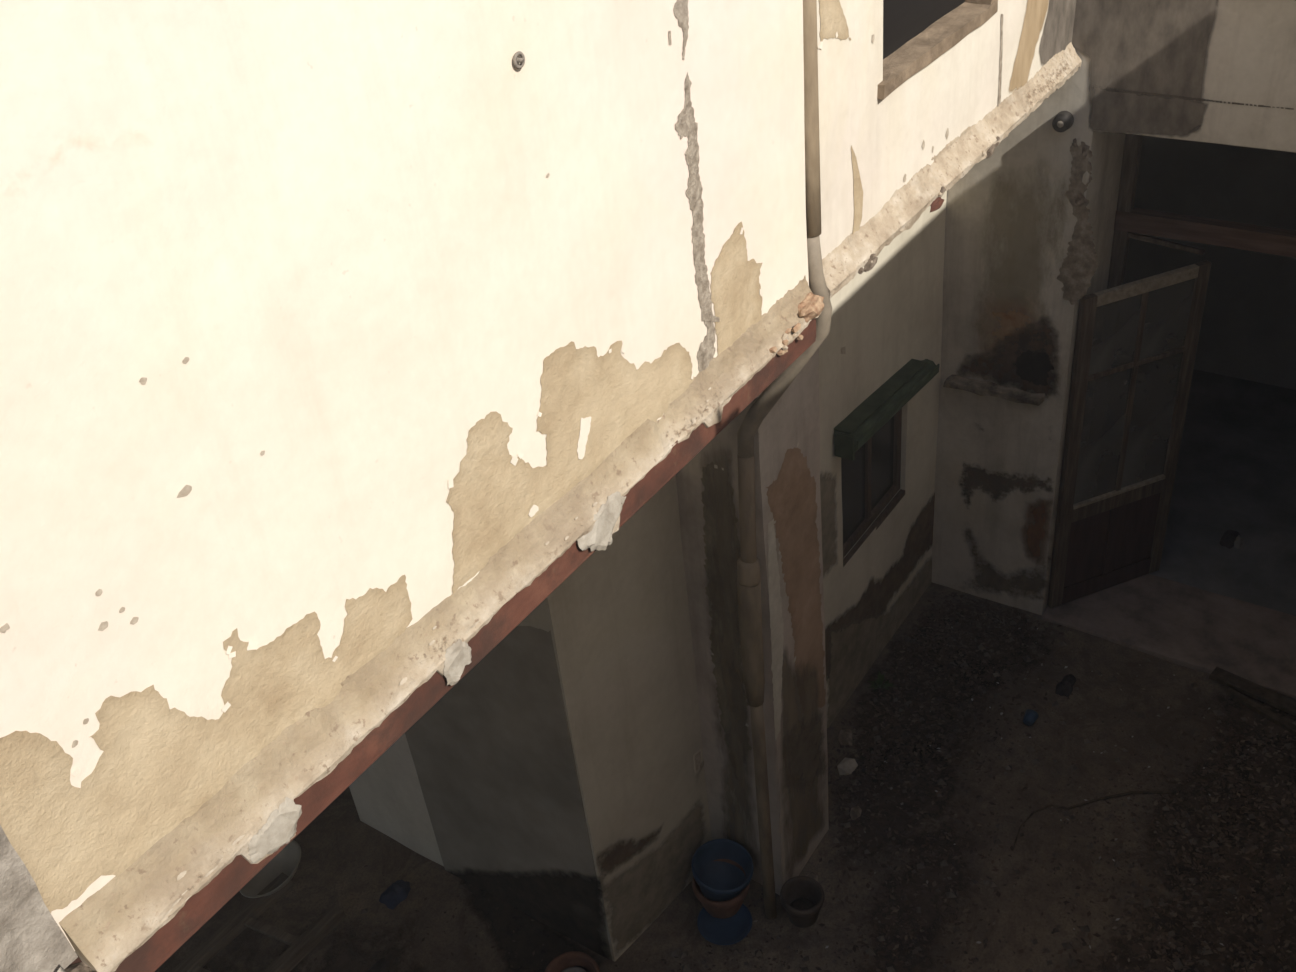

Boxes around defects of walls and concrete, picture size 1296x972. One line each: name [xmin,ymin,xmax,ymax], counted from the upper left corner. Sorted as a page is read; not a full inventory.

peeling [818,0,851,49]
damp [1009,0,1218,137]
peeling [710,221,763,357]
flaking render [769,292,824,355]
flaking render [1057,138,1097,305]
peeling [429,626,472,686]
peeling [446,340,711,594]
peeling [767,442,826,708]
damp [820,473,837,576]
damp [825,493,935,680]
peeling [0,575,413,921]
damp [449,827,661,972]